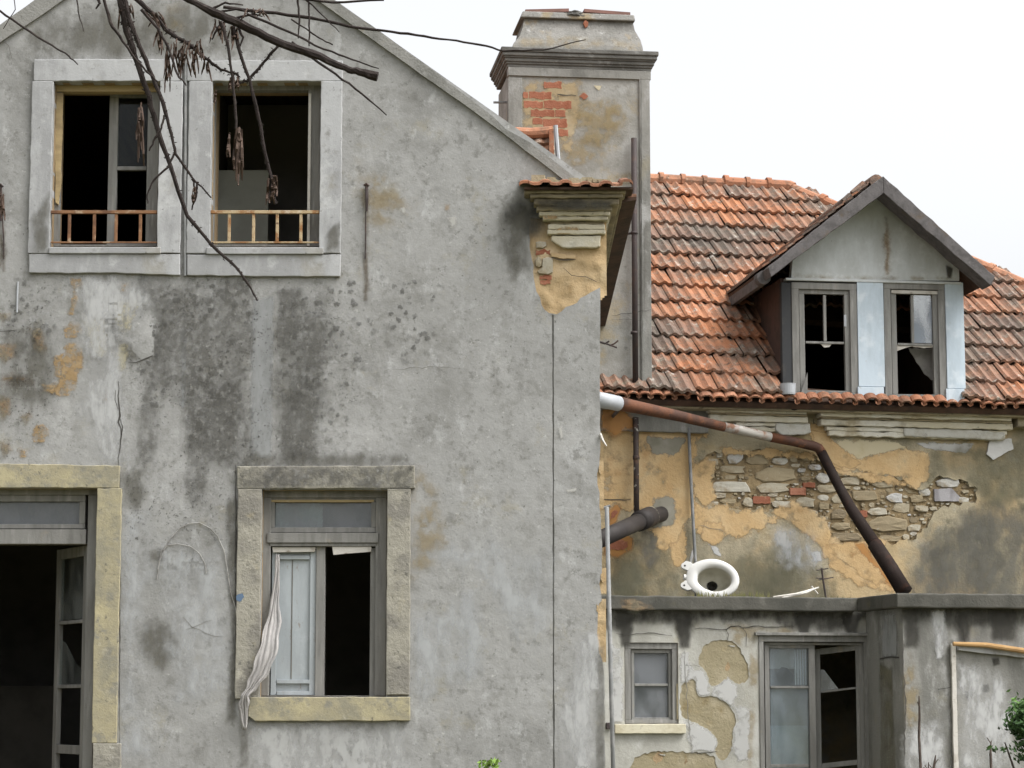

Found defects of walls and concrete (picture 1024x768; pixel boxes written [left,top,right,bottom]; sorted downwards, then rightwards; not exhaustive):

flaking render [522,81,581,152]
flaking render [529,216,607,314]
flaking render [42,279,83,396]
water stain [83,276,412,497]
flaking render [986,438,1014,460]
flaking render [597,423,976,592]
water stain [912,449,1024,594]
water stain [620,619,632,646]
water stain [677,619,690,647]
water stain [906,611,919,646]
water stain [993,612,1016,639]
flaking render [630,640,750,768]